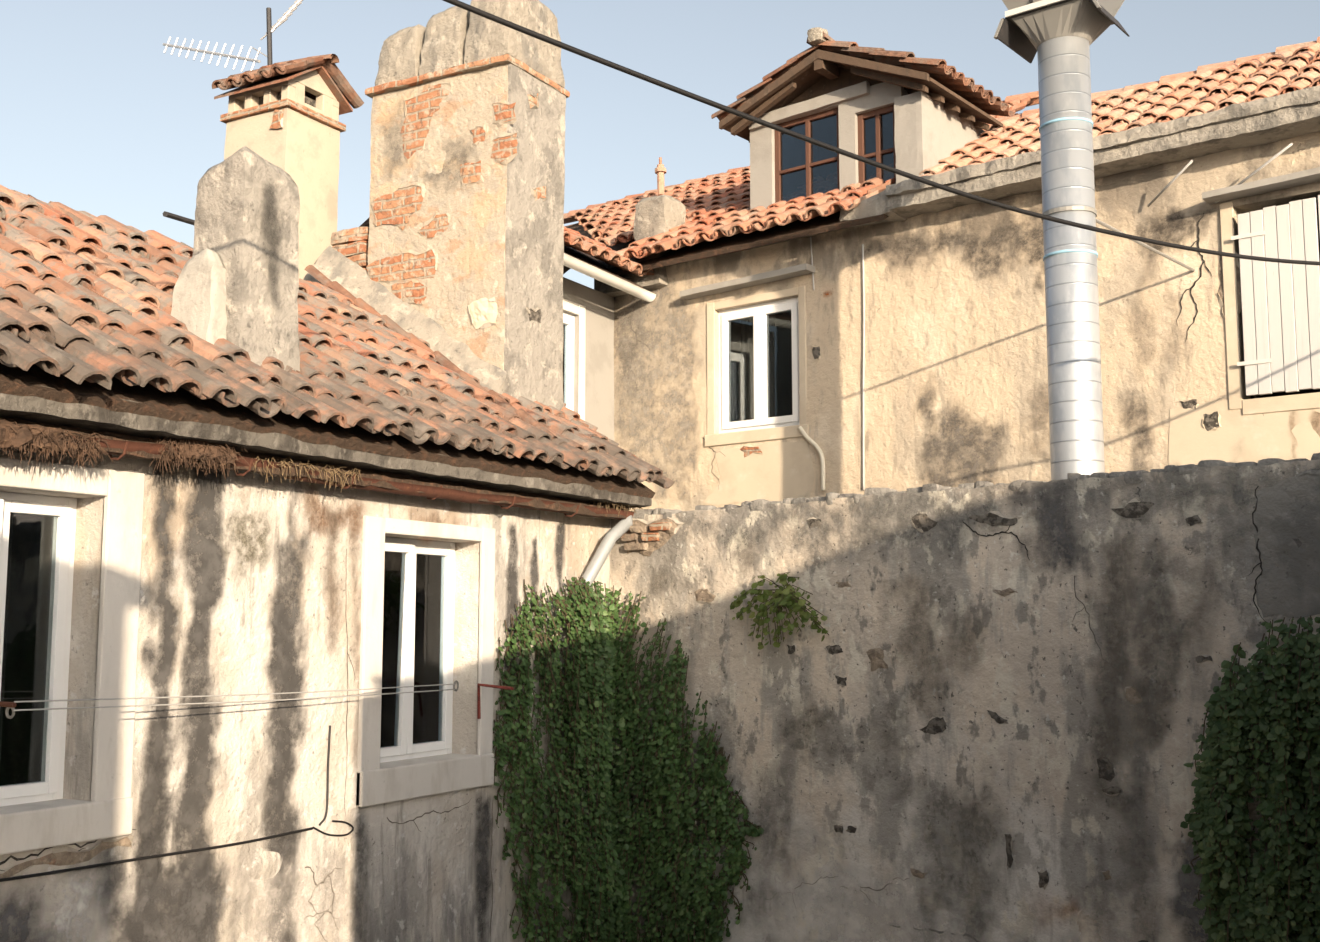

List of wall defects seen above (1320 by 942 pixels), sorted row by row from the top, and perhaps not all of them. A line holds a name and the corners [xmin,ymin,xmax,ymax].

flaking render [400,82,453,164]
flaking render [460,93,540,188]
flaking render [366,182,450,305]
water stain [867,217,1044,275]
crack [1176,213,1212,342]
water stain [919,392,1003,487]
water stain [1127,403,1150,469]
spalling [968,510,1022,526]
crack [1249,486,1268,623]
water stain [0,462,367,942]
crack [0,840,97,871]
crack [765,874,978,942]